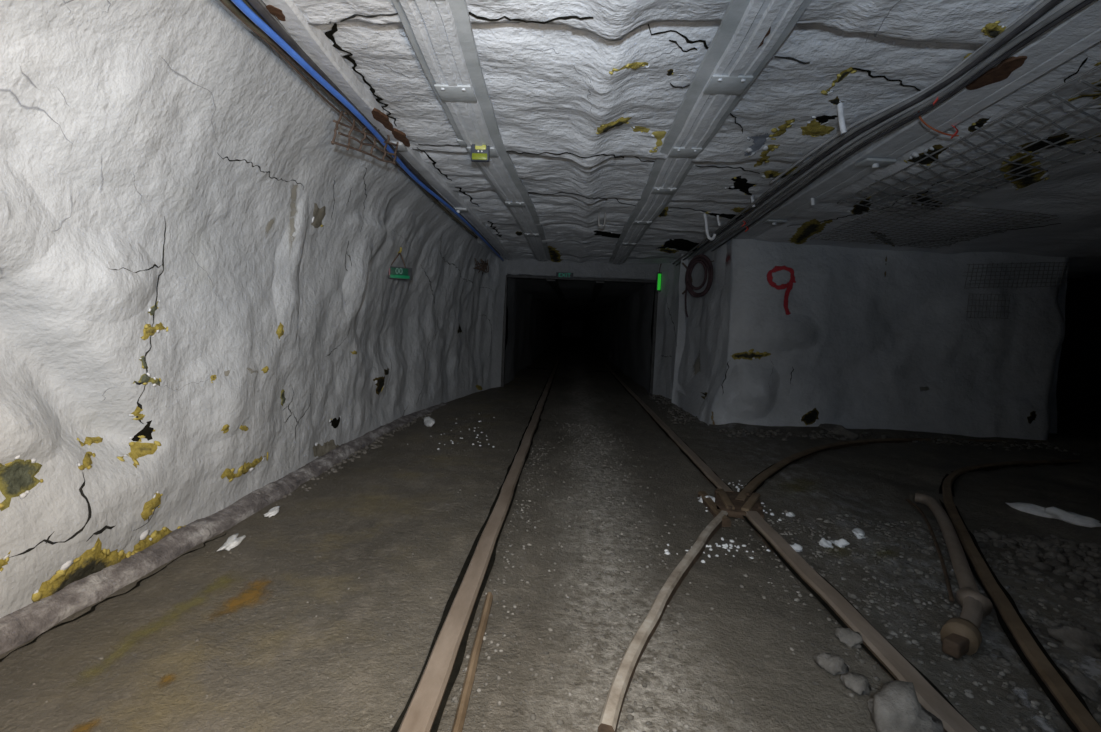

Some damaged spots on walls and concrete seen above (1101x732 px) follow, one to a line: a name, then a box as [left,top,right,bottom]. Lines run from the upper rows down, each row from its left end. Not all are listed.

crack [469,12,593,54]
crack [640,24,709,60]
crack [774,56,810,64]
spalling [981,21,1006,38]
corrosion [966,56,1027,90]
spalling [594,117,667,155]
spalling [904,144,948,166]
spalling [998,133,1076,190]
spalling [117,406,161,468]
spalling [221,452,269,482]
crack [9,474,159,558]
spalling [31,491,186,603]